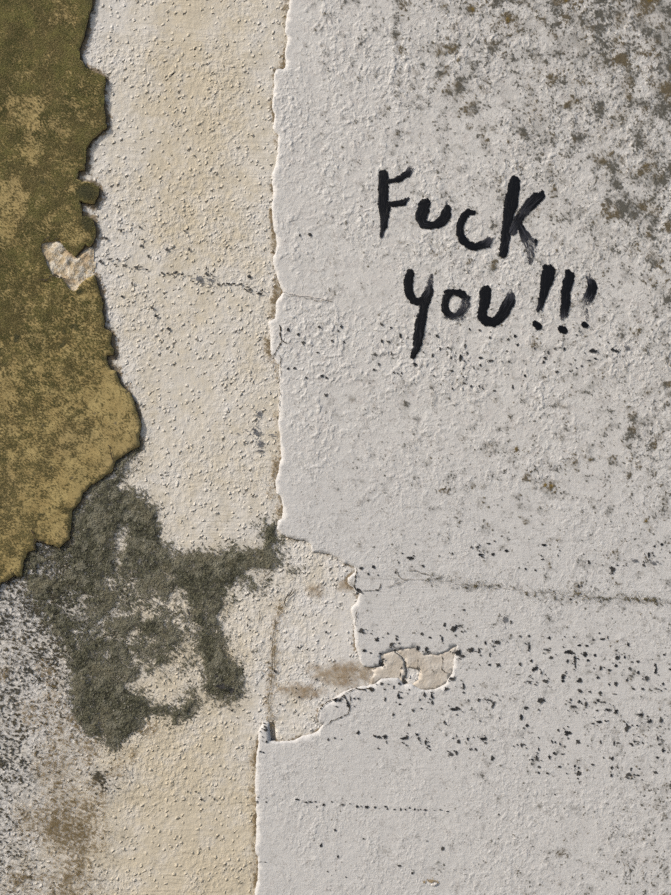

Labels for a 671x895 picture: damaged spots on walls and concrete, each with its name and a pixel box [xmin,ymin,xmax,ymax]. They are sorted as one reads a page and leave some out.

water stain [315,0,671,586]
peeling [0,0,519,895]
water stain [538,531,658,644]
spalling [601,543,664,574]
water stain [0,440,306,895]
water stain [279,683,318,698]
water stain [309,663,371,686]
spalling [513,698,581,779]
spalling [543,632,671,758]
water stain [526,712,671,895]